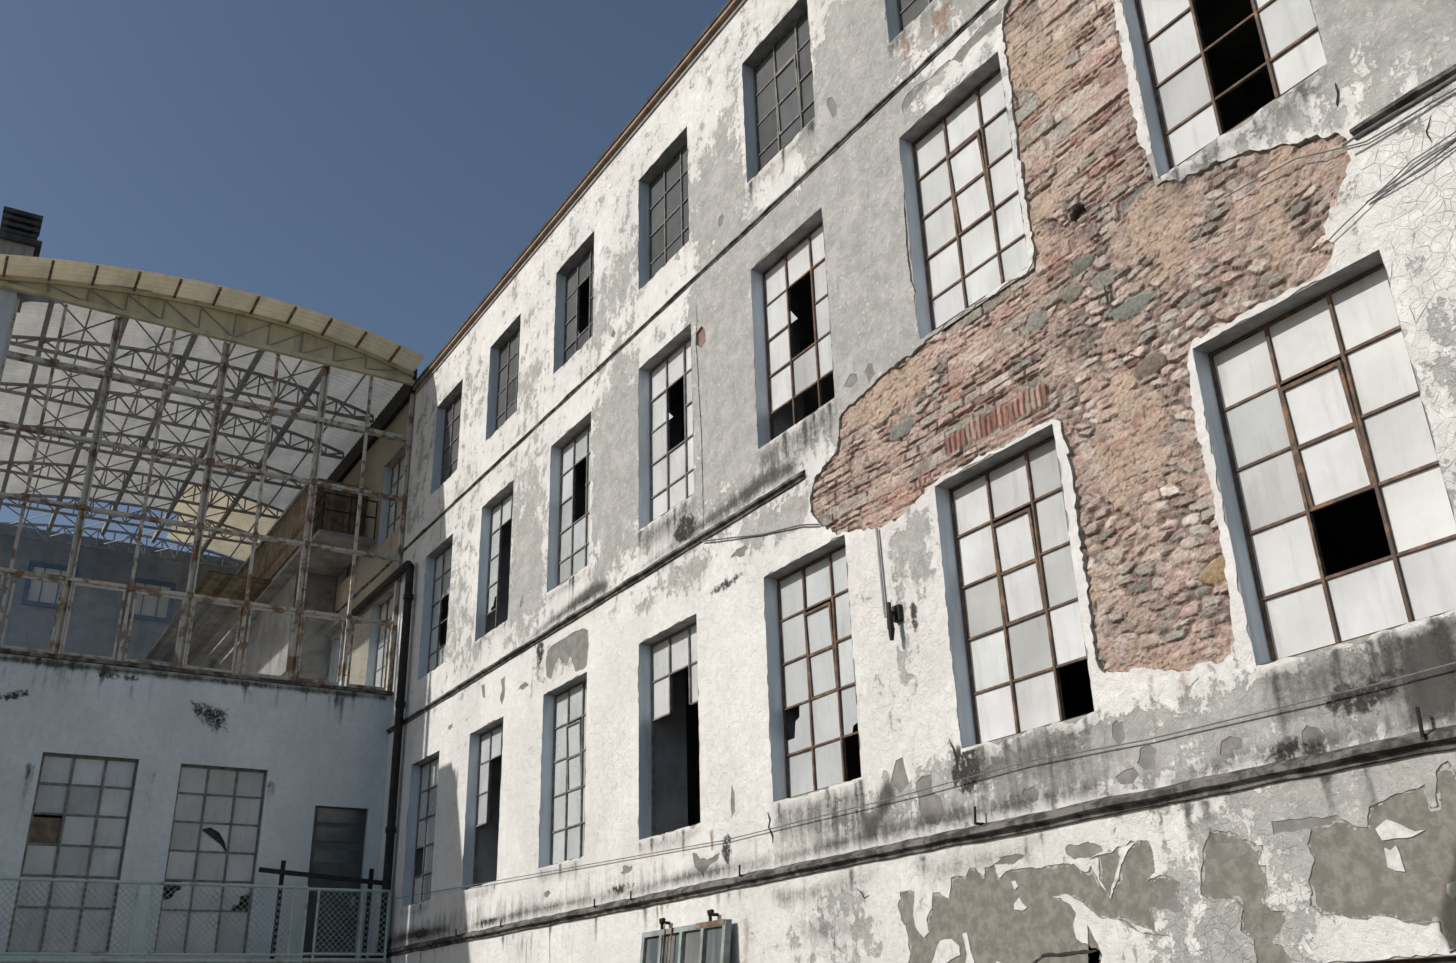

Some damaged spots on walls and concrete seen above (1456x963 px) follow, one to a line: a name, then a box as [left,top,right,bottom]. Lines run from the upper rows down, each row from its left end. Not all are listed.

crack [1333,83,1341,107]
crack [1353,116,1456,331]
flaking render [810,0,1351,673]
crack [1422,388,1456,485]
peeling [546,628,589,680]
damp [910,602,918,631]
damp [1326,618,1456,723]
peeling [891,758,944,825]
damp [814,746,1087,850]
damp [1266,736,1325,763]
peeling [897,840,1185,963]
peeling [1200,760,1456,963]